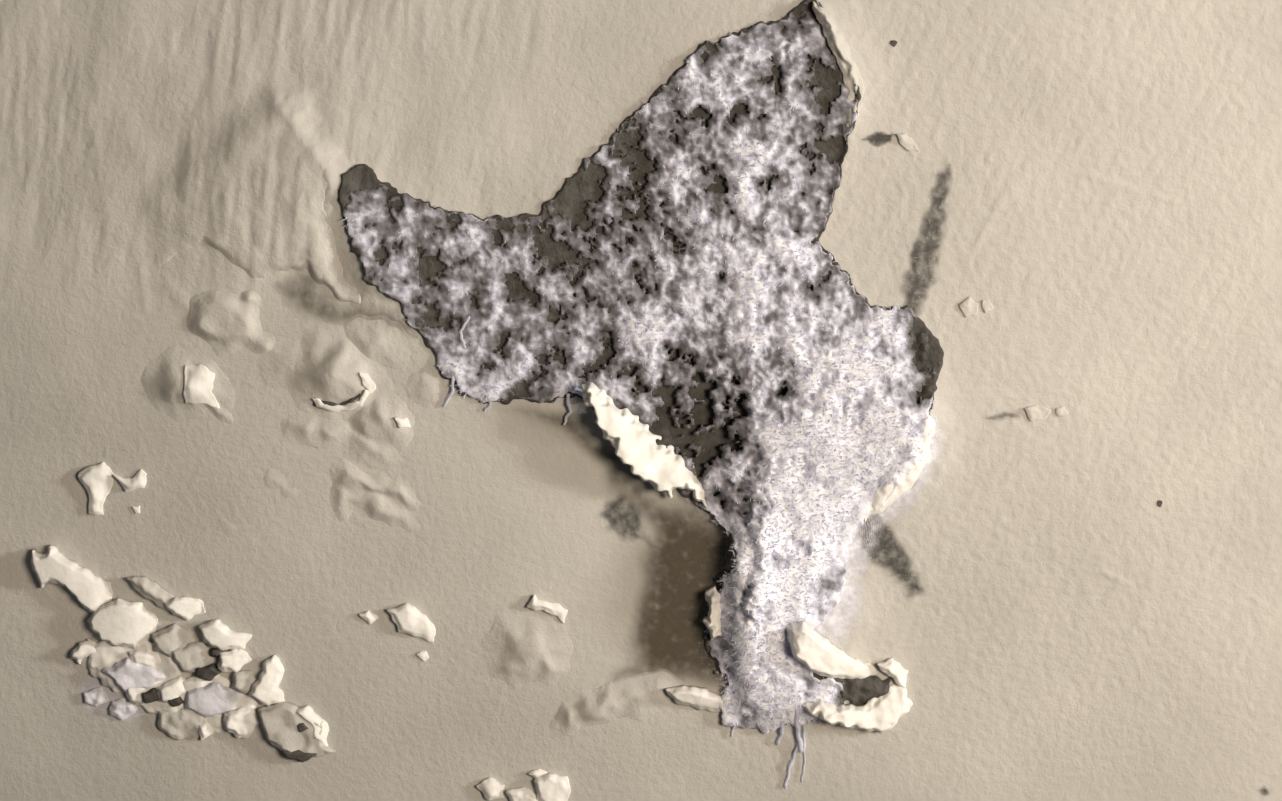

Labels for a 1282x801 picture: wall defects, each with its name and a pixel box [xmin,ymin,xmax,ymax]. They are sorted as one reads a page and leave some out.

peeling [338,0,944,522]
peeling [78,462,147,516]
peeling [31,544,336,762]
peeling [359,603,436,661]
peeling [527,594,568,623]
peeling [665,550,737,712]
peeling [786,621,913,734]
peeling [476,769,571,801]